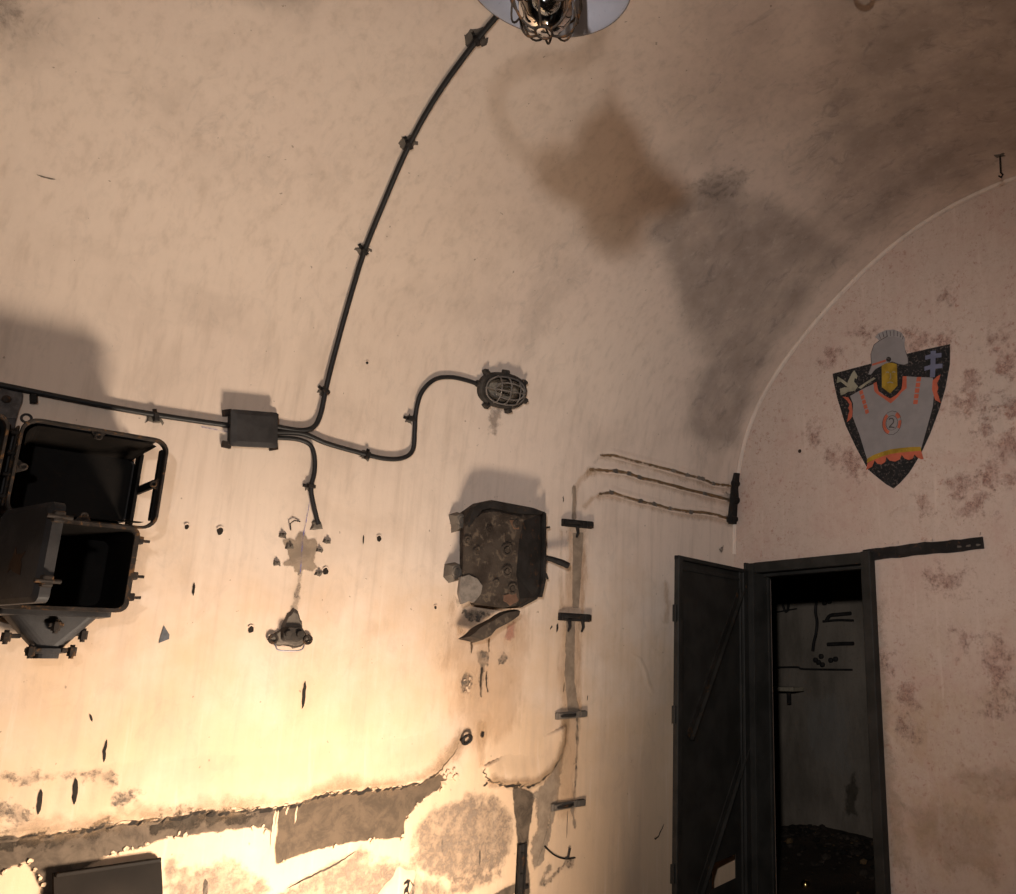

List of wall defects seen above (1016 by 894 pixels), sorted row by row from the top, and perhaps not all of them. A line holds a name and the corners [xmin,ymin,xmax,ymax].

spalling [0,767,459,894]
flaking render [409,788,534,894]